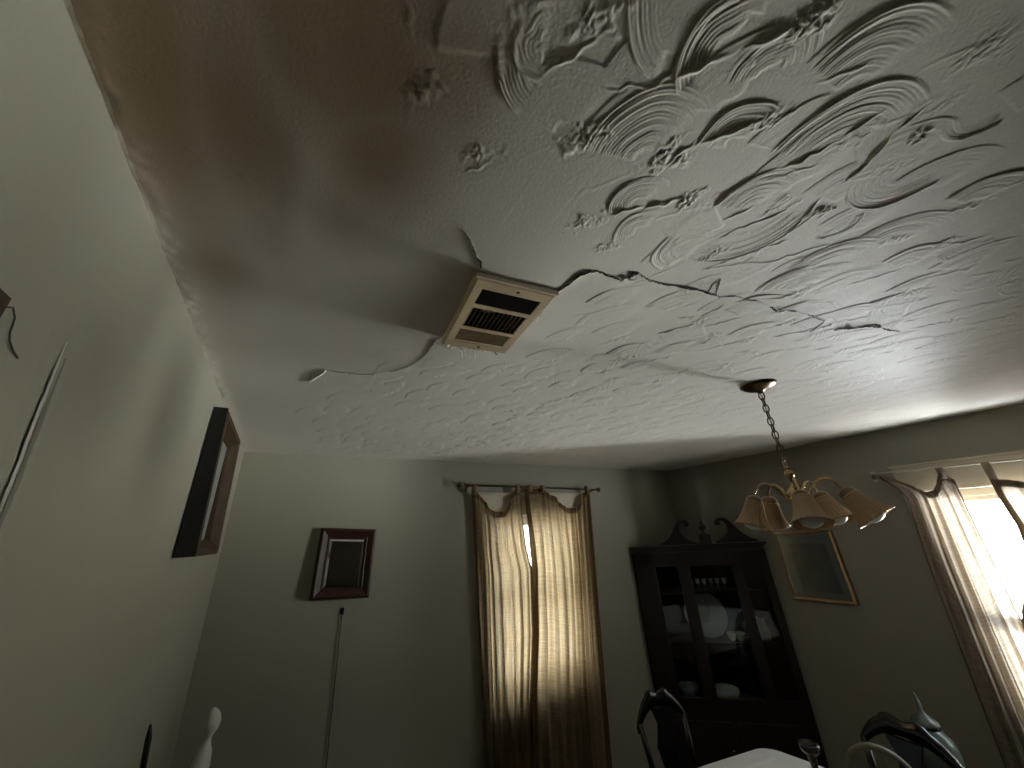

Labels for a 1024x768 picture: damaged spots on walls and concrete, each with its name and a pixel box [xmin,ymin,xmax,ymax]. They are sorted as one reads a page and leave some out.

water stain [70,0,185,140]
crack [557,271,900,332]